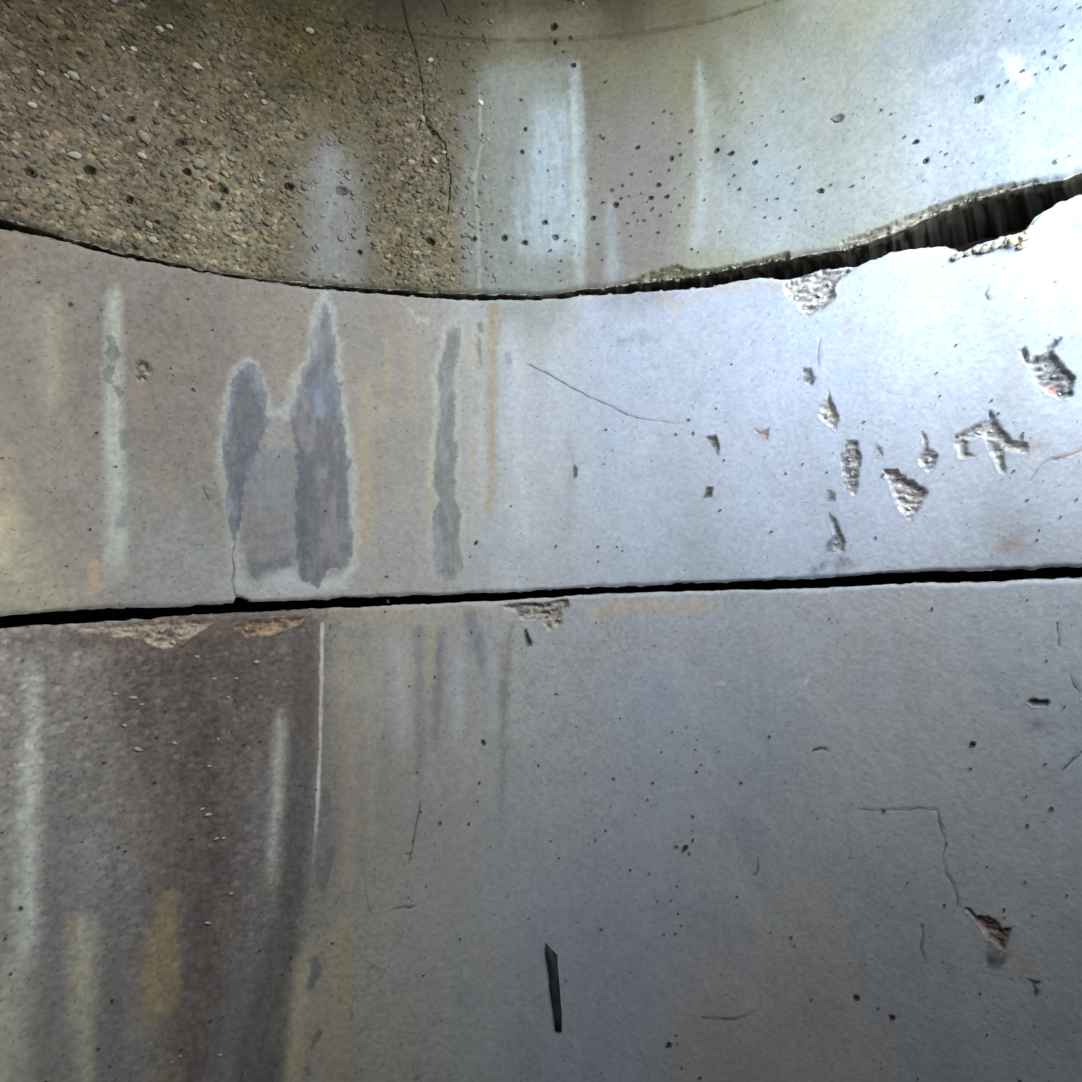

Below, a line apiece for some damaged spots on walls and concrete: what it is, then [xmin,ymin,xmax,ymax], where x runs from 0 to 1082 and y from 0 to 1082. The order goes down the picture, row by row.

crack [402,0,457,213]
water stain [209,120,381,600]
water stain [398,48,763,587]
crack [527,364,671,423]
spalling [782,267,858,318]
spalling [950,225,1037,262]
spalling [1017,336,1077,401]
crack [229,544,237,595]
spalling [65,617,218,650]
water stain [310,625,337,897]
water stain [0,625,294,1082]
crack [862,807,958,905]